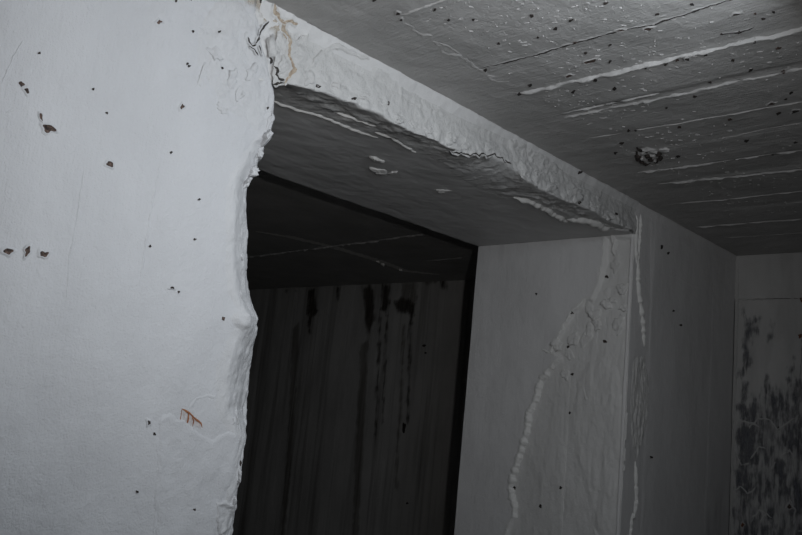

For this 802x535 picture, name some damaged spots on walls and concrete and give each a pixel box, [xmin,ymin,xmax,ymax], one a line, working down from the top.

crack [247,3,300,88]
crack [403,0,732,82]
peeling [444,0,713,125]
crack [450,150,511,165]
spalling [597,104,802,216]
spalling [186,0,646,535]
damp [364,284,414,362]
crack [629,461,639,535]
damp [732,379,802,535]